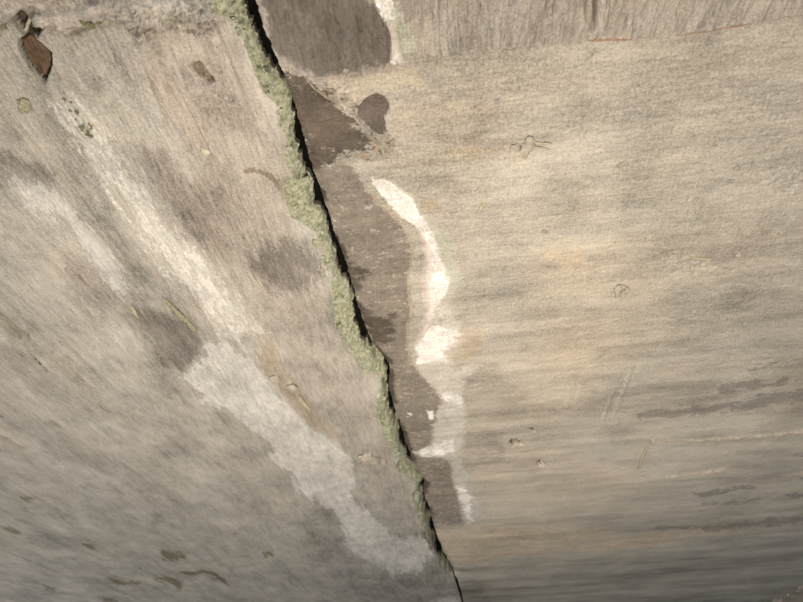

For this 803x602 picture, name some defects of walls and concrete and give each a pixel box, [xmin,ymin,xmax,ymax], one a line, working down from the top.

spalling [16,10,53,80]
crack [245,0,284,75]
damp [0,0,493,586]
crack [292,99,411,458]
crack [420,478,463,602]